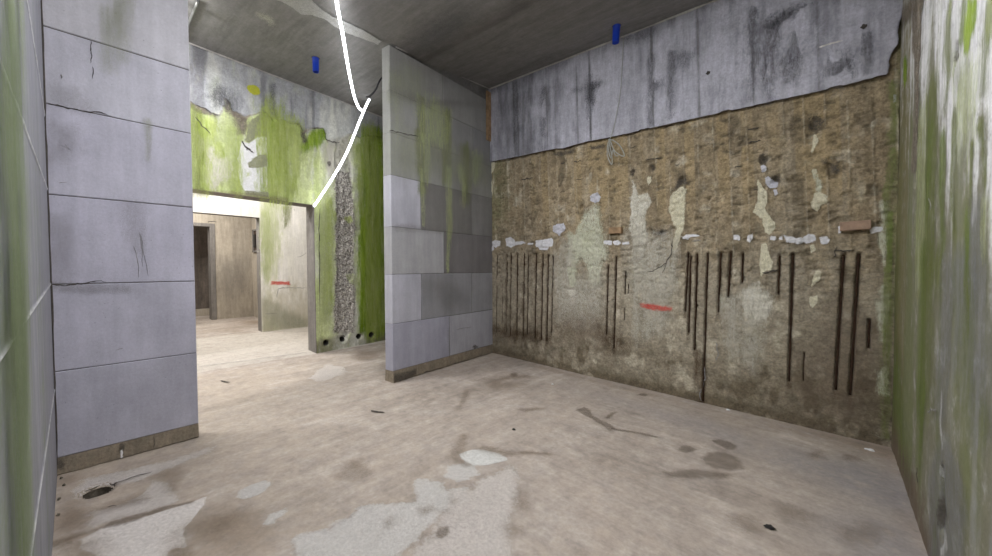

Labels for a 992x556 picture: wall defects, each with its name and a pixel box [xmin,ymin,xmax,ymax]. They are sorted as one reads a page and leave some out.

crack [40,0,109,464]
crack [133,232,148,278]
damp [190,79,327,305]
damp [258,198,337,331]
spalling [321,134,357,334]
damp [352,58,490,362]
peeling [492,153,841,403]
damp [645,47,698,128]
peeling [805,113,844,211]
damp [714,0,992,556]
spalling [831,199,891,404]